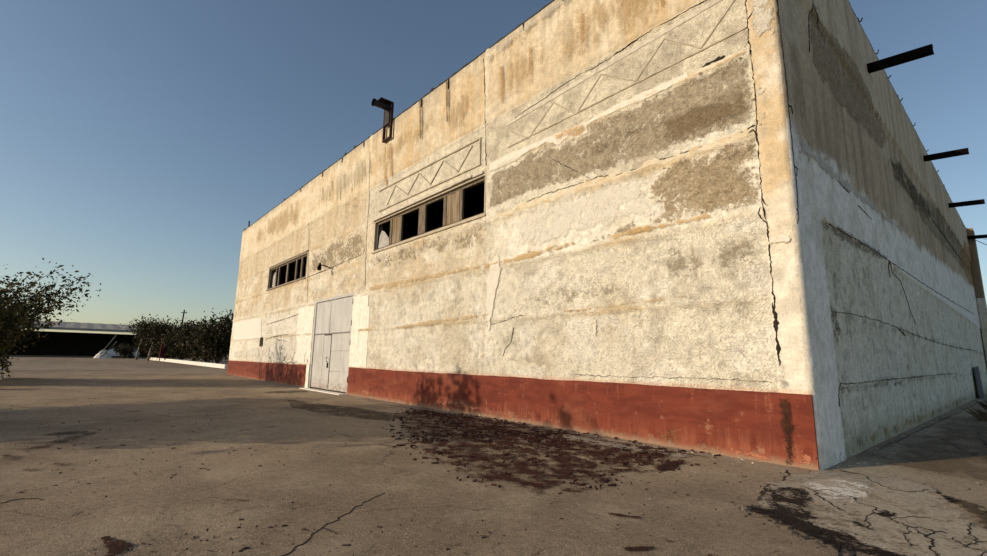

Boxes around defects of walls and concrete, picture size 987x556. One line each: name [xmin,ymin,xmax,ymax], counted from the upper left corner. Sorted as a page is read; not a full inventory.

crack [481,59,489,165]
crack [527,159,637,202]
crack [512,0,707,120]
spalling [489,57,764,207]
crack [576,0,799,382]
spalling [650,139,762,228]
crack [808,3,823,51]
spalling [808,7,887,148]
spalling [890,158,933,218]
crack [828,219,976,351]
water stain [779,363,794,464]
crack [838,373,956,407]